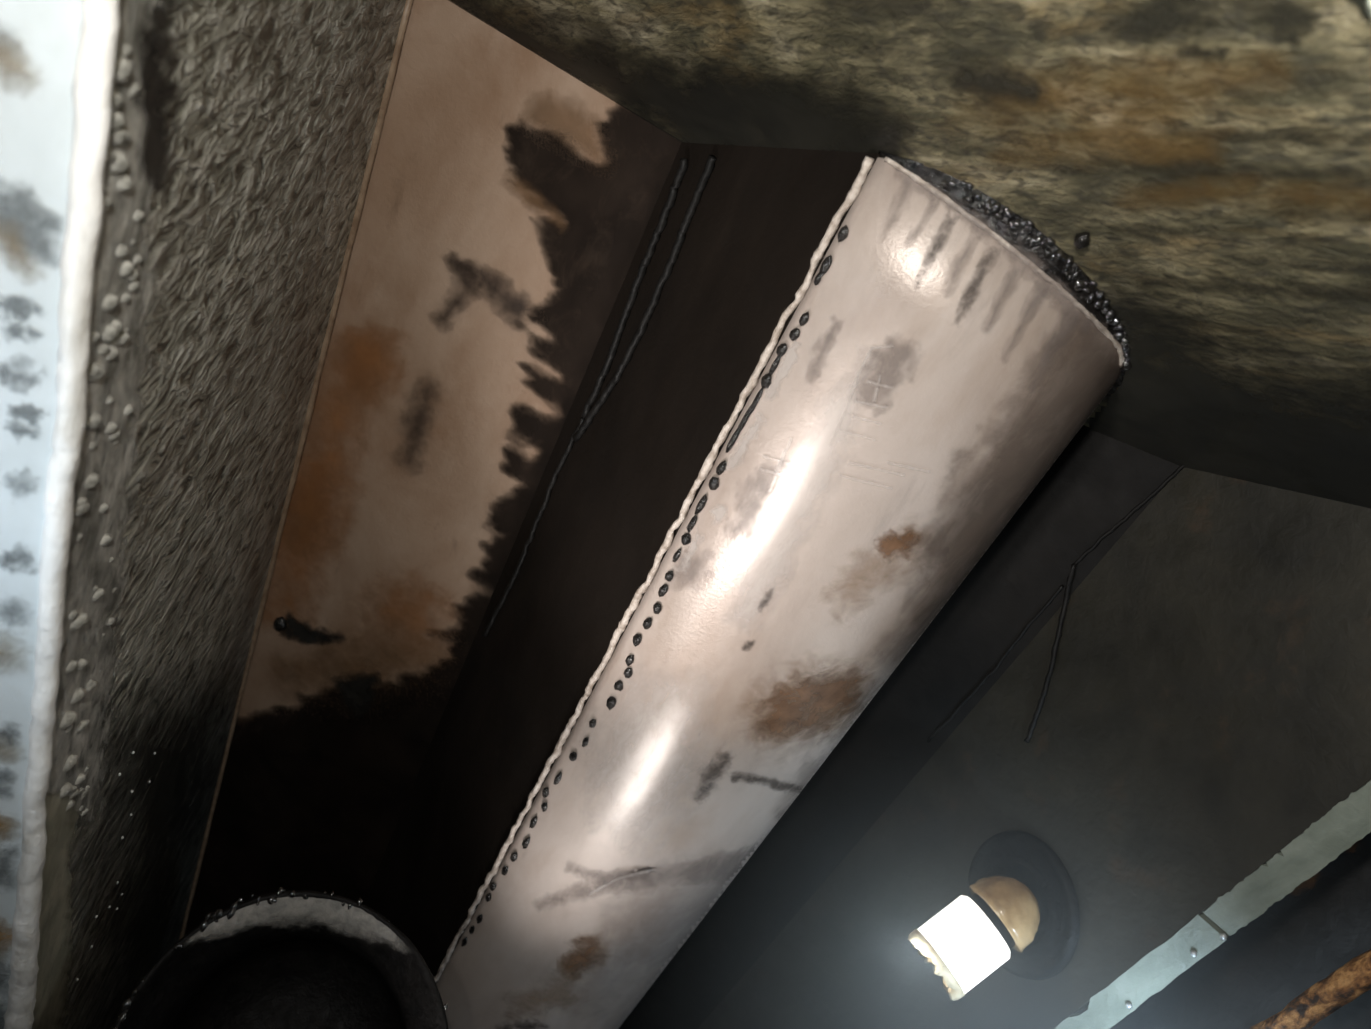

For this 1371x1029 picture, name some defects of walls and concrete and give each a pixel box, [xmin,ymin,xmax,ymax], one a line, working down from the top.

water stain [0,192,57,269]
water stain [925,220,951,265]
water stain [0,297,38,337]
water stain [437,257,530,325]
water stain [963,254,992,309]
water stain [11,406,38,437]
water stain [2,553,27,566]
rust [848,530,919,588]
rust [759,676,863,737]